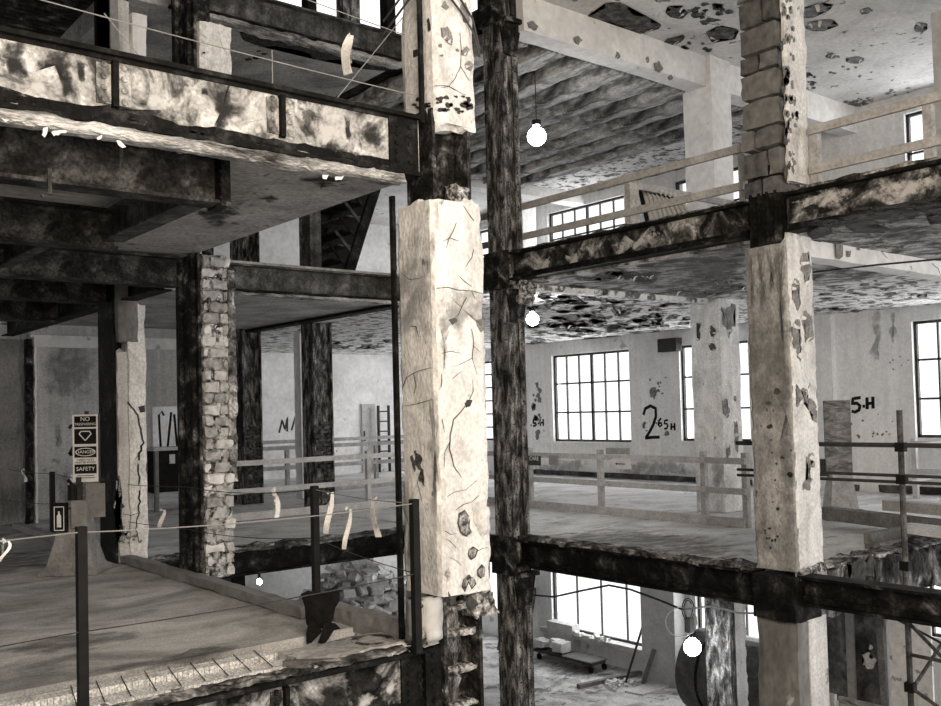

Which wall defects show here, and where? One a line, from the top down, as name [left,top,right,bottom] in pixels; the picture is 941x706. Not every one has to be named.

crack [434,36,470,95]
peeling [588,0,739,52]
peeling [782,0,839,174]
peeling [806,50,872,90]
peeling [802,178,941,242]
crack [402,205,484,497]
peeling [525,271,747,351]
peeling [791,252,927,362]
peeling [795,384,817,423]
crack [125,402,145,543]
peeling [802,452,817,490]
flaking render [445,496,489,609]